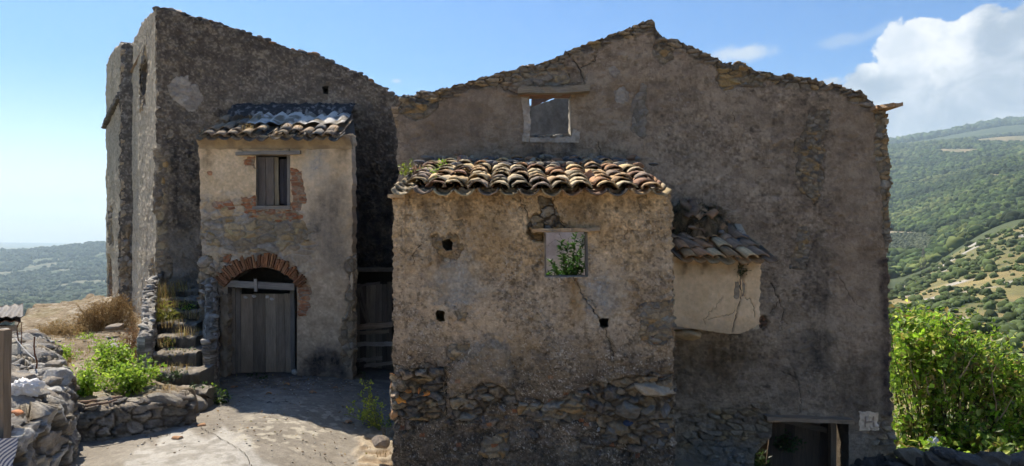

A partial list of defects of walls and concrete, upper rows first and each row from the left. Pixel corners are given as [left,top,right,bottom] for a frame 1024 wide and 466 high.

spalling [196,168,309,320]
spalling [527,196,567,241]
crack [703,264,784,331]